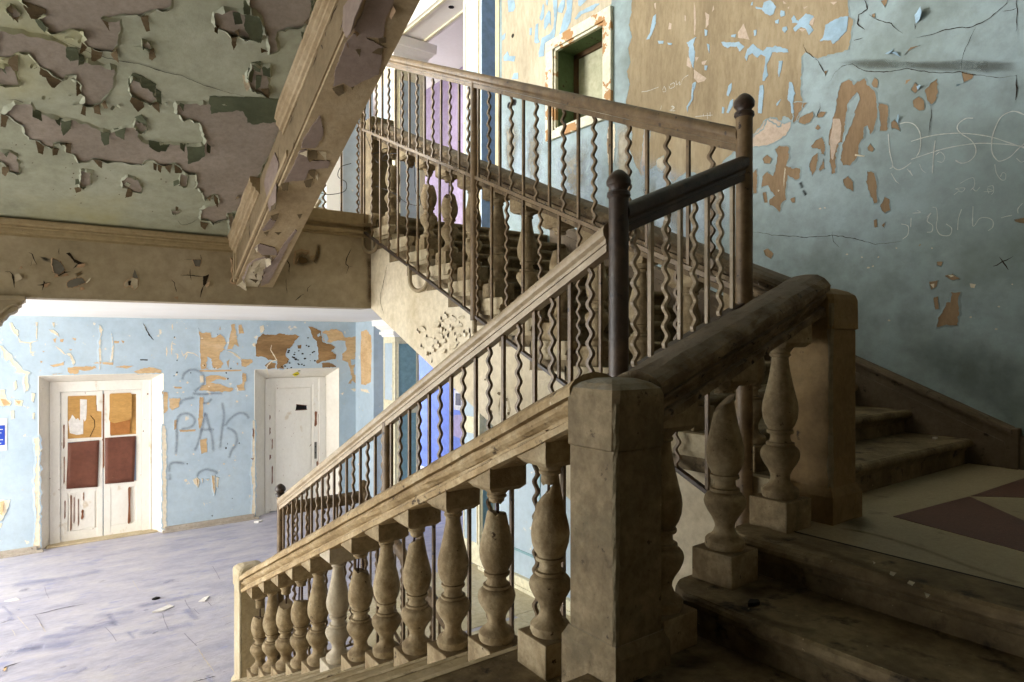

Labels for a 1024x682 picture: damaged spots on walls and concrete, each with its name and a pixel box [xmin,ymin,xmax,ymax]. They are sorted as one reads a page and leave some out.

peeling [330,0,395,96]
peeling [501,0,612,91]
crack [803,0,1018,100]
peeling [0,0,330,291]
peeling [625,0,901,228]
peeling [0,345,36,420]
peeling [9,322,372,530]
peeling [416,312,470,363]
peeling [929,261,976,329]
spalling [0,499,11,528]
spalling [31,434,43,550]